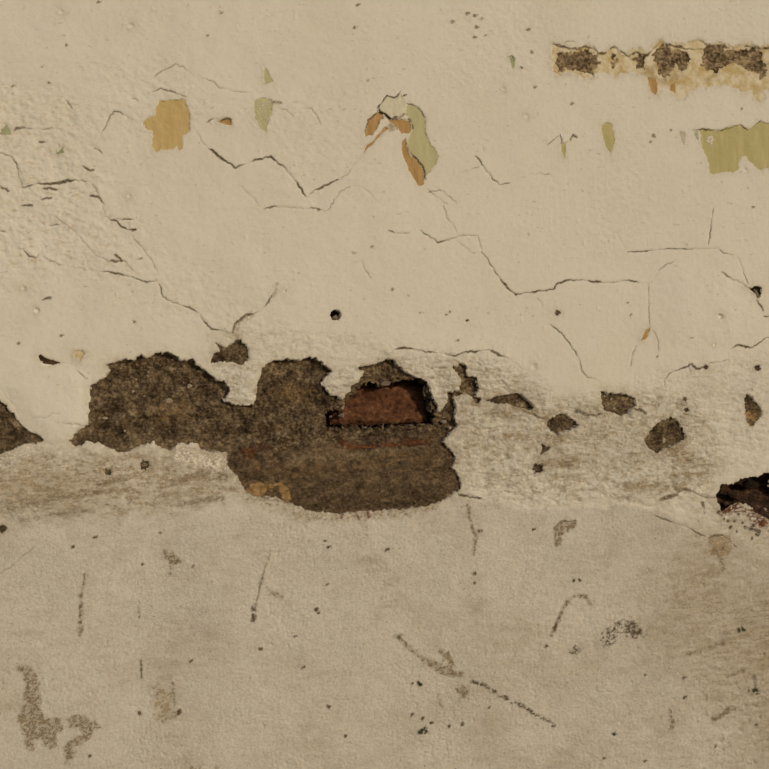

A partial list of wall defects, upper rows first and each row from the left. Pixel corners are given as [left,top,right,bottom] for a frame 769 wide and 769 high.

peeling [551,39,769,102]
crack [210,149,281,168]
peeling [364,92,438,186]
peeling [670,121,769,175]
crack [24,167,94,206]
crack [297,179,338,210]
crack [501,279,601,296]
crack [185,296,272,330]
crack [454,349,502,357]
spalling [0,340,534,514]
spalling [644,417,685,453]
spalling [716,473,769,529]